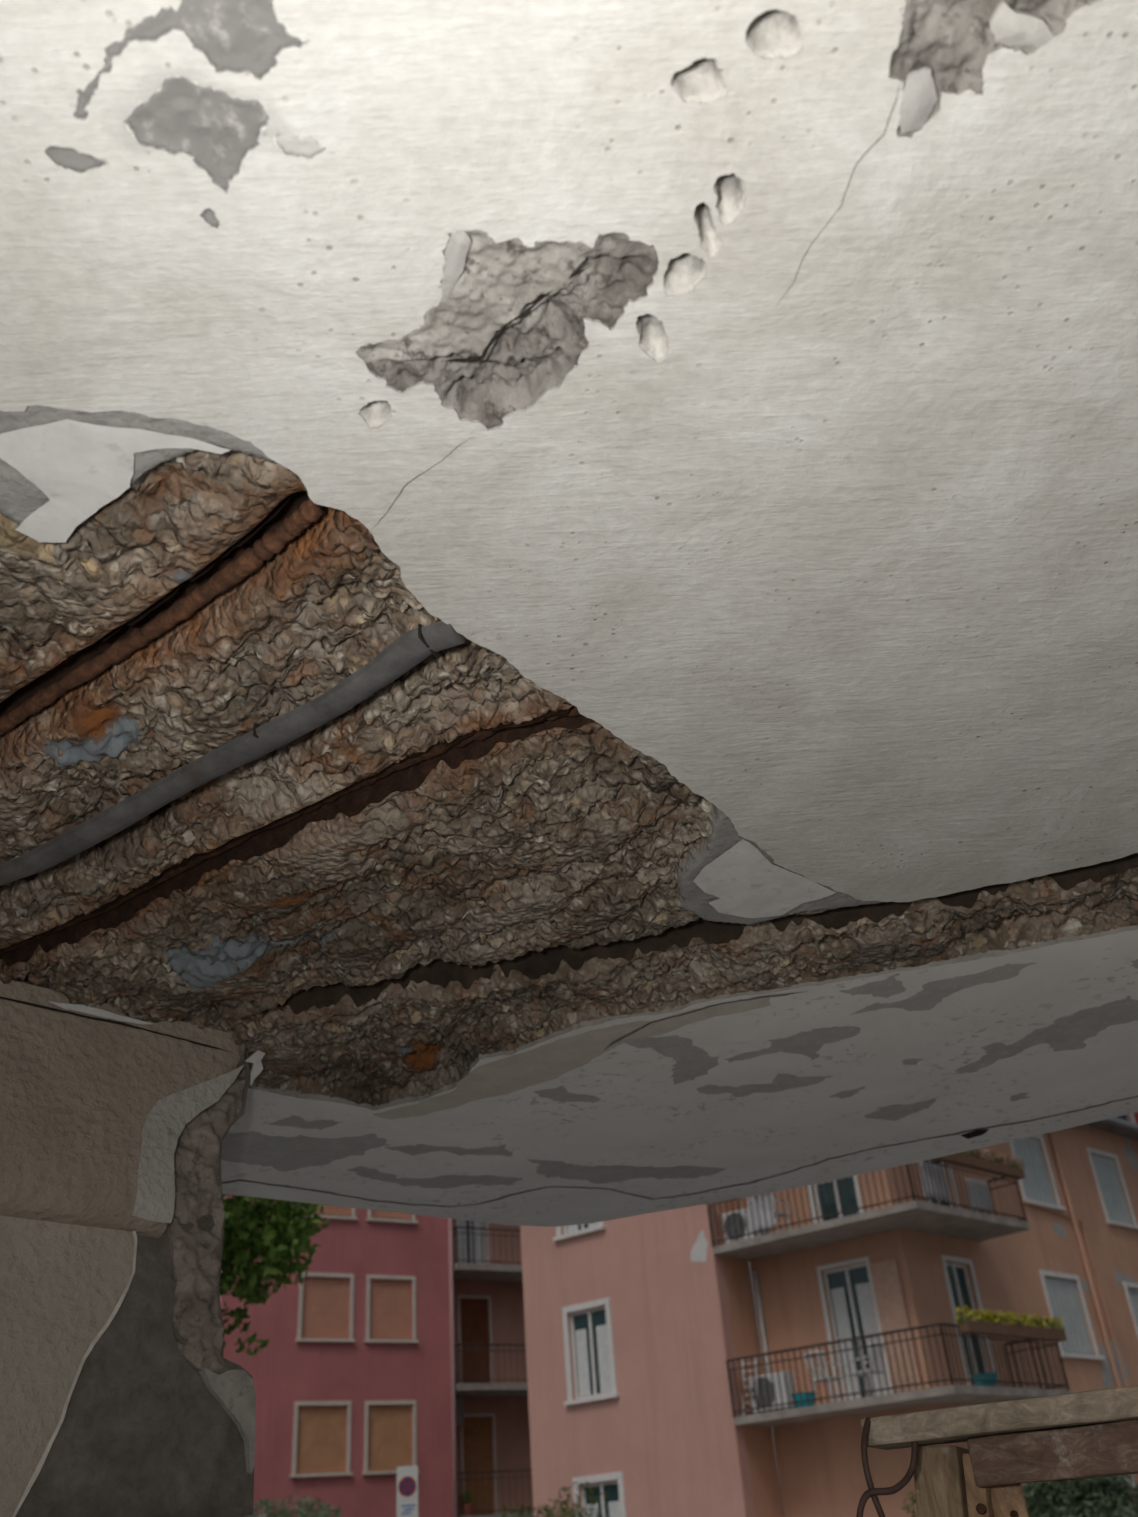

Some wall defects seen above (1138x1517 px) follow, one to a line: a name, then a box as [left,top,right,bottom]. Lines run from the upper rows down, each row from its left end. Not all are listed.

flaking render [45,146,105,173]
peeling [73,0,326,195]
flaking render [199,208,220,228]
flaking render [671,58,727,104]
flaking render [746,9,803,61]
crack [775,85,900,308]
flaking render [889,0,1098,138]
flaking render [355,173,746,431]
spalling [0,405,1138,1517]